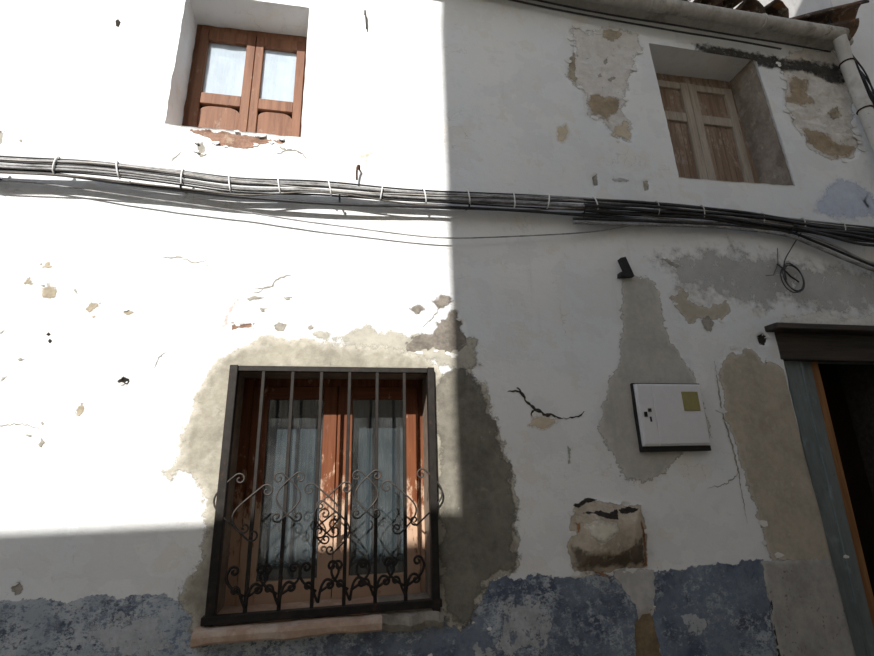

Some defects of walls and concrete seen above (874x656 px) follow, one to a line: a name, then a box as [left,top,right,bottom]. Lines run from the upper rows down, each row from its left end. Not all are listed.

peeling [565,24,643,143]
spalling [776,48,866,163]
spalling [190,129,284,152]
spalling [405,295,466,358]
peeling [669,288,730,332]
crack [507,387,585,419]
spalling [10,582,23,595]